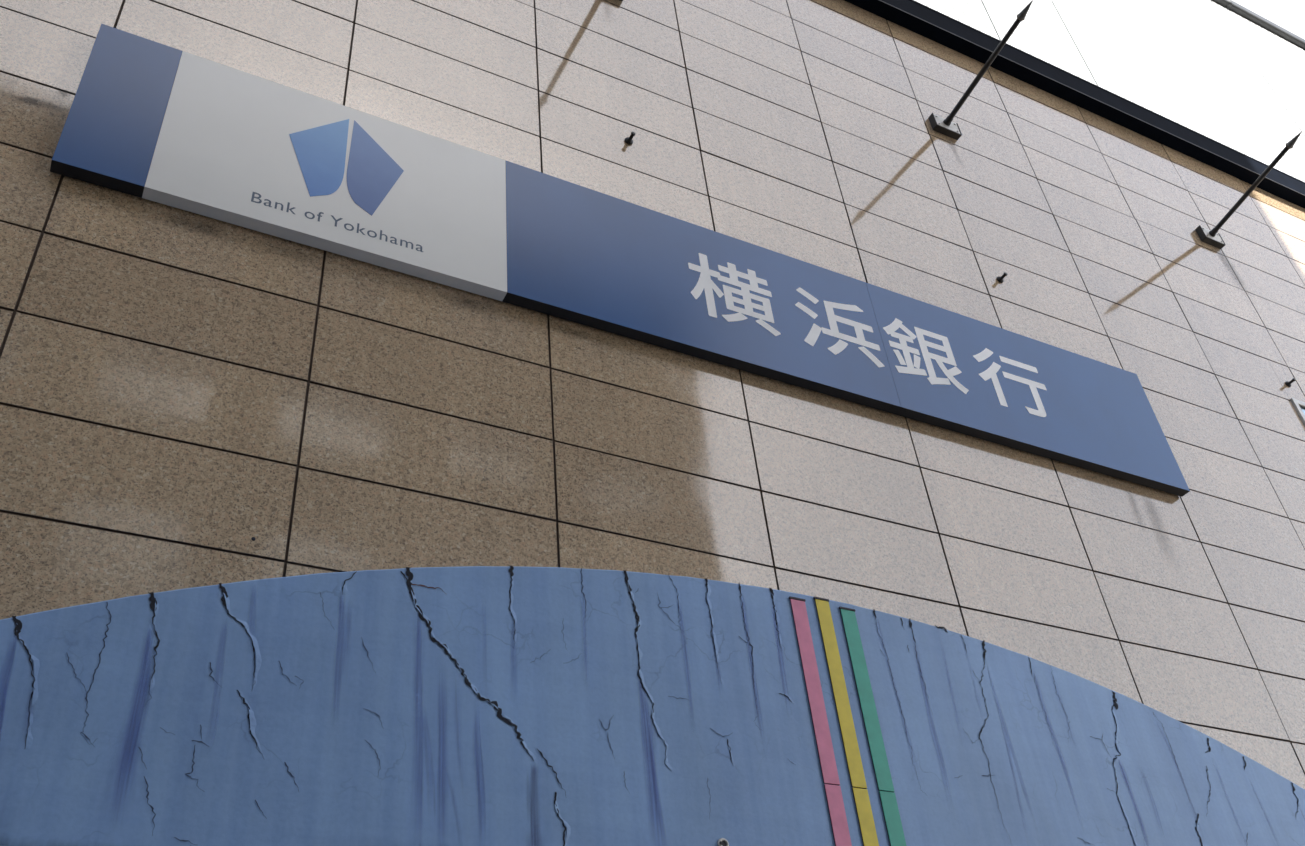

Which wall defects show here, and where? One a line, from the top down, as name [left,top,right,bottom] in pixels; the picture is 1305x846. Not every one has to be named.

crack [12,602,112,749]
crack [138,592,206,845]
crack [209,583,302,791]
crack [400,567,571,846]
crack [509,566,586,663]
crack [623,570,794,804]
crack [1028,657,1138,846]